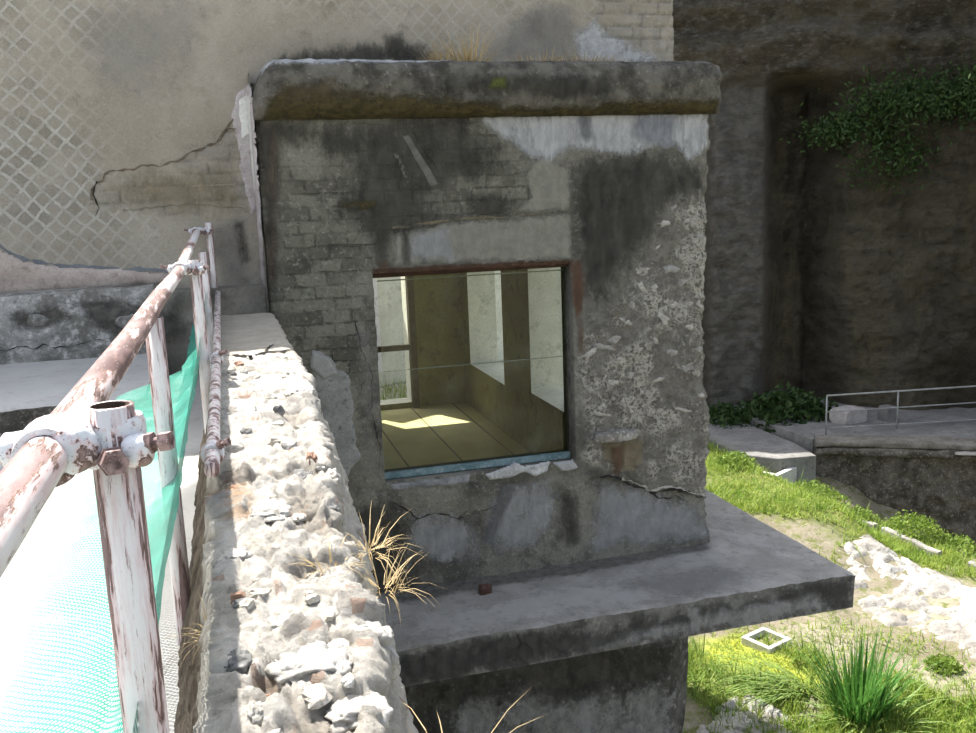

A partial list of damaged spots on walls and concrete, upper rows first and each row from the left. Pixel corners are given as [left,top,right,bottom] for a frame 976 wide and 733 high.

damp [261,37,447,71]
crack [90,119,235,214]
flaking render [180,83,265,285]
damp [580,153,702,298]
flaking render [0,250,170,293]
crack [226,344,291,360]
spalling [390,474,470,490]
spalling [485,460,578,480]
crack [600,475,706,502]